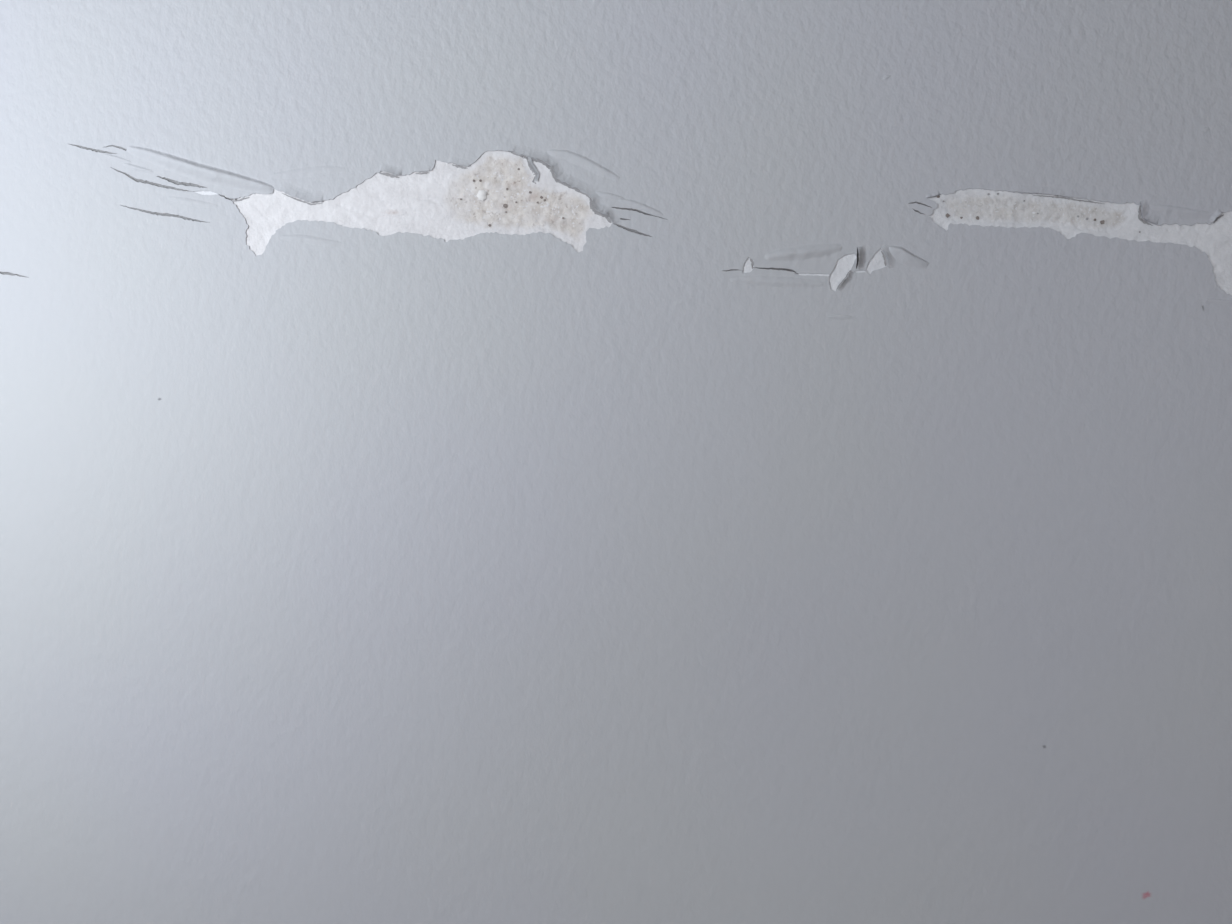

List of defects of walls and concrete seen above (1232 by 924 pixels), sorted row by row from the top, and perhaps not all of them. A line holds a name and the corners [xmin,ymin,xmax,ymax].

crack [70,144,237,223]
peeling [232,142,621,256]
peeling [723,244,896,292]
peeling [925,185,1232,295]